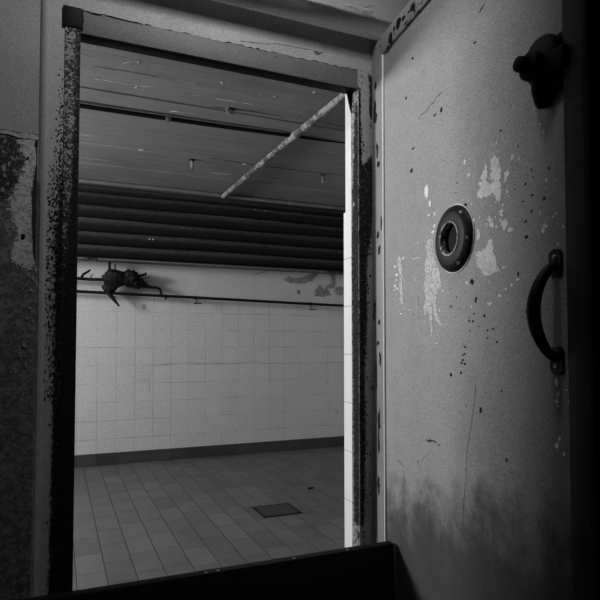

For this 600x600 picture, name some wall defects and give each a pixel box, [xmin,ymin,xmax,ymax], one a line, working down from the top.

leakage [0,134,26,201]
corrosion [44,28,80,595]
corrosion [351,75,374,526]
peeling [393,251,414,316]
peeling [413,224,452,344]
peeling [463,129,526,286]